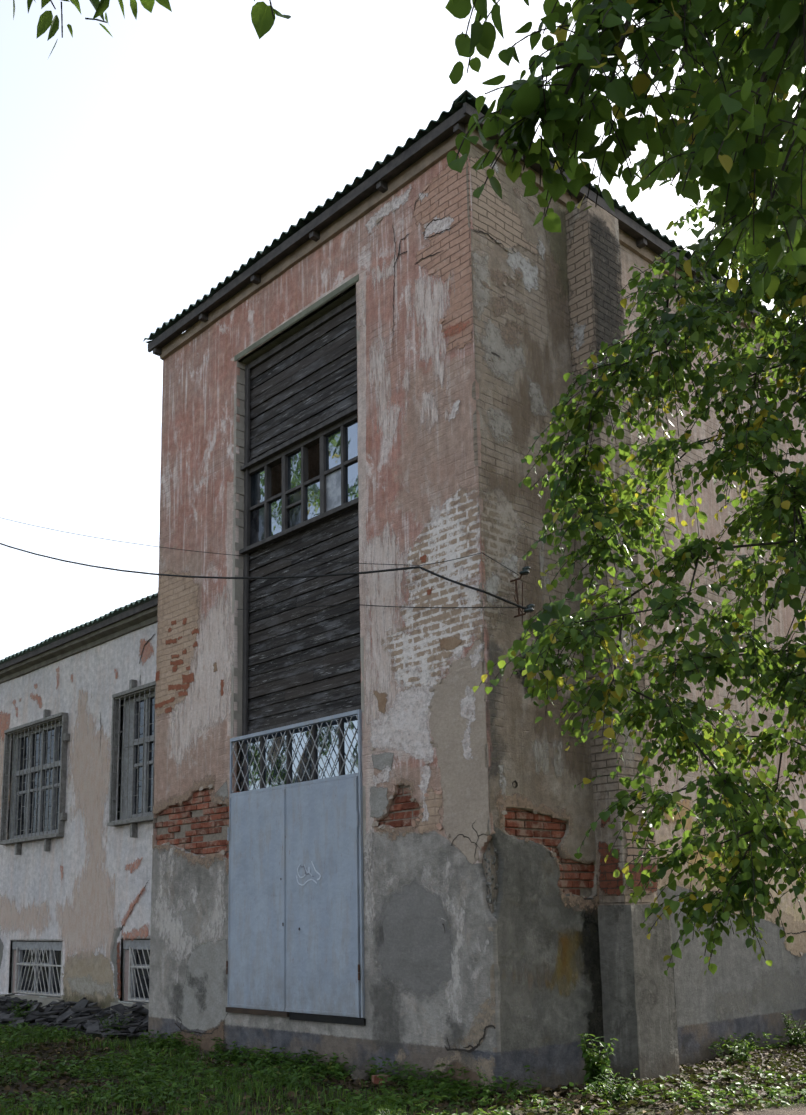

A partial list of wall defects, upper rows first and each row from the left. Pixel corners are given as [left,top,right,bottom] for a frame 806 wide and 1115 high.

peeling [358,258,398,326]
peeling [365,157,546,442]
peeling [0,684,42,821]
peeling [139,570,233,767]
peeling [361,487,722,917]
peeling [56,667,149,998]
spalling [152,775,240,875]
leakage [364,830,399,941]
leakage [421,861,489,1046]
crack [451,820,490,857]
peeling [731,895,806,957]
crack [445,1025,495,1053]